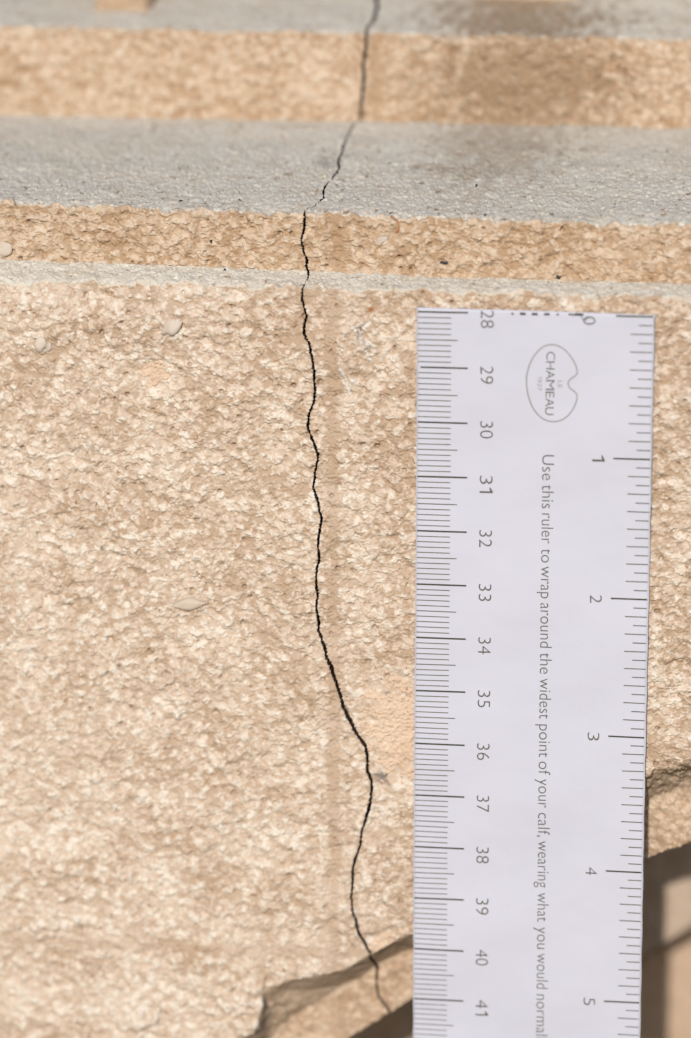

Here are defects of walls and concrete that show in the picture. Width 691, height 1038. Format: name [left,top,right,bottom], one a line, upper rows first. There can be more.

crack [300,0,390,1012]
spalling [348,664,415,795]
spalling [368,930,413,954]